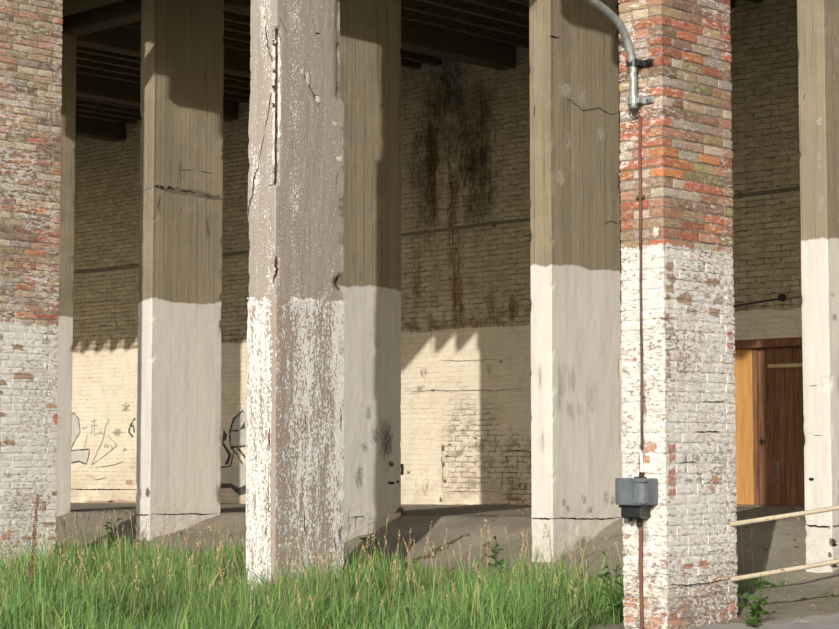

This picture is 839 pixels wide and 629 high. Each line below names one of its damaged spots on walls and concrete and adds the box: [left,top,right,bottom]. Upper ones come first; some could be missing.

crack [248,17,287,222]
crack [155,169,224,211]
peeling [246,0,345,593]
peeling [665,261,696,313]
peeling [705,278,723,316]
peeling [0,372,33,401]
peeling [643,443,657,463]
peeling [667,443,721,497]
peeling [682,560,710,569]